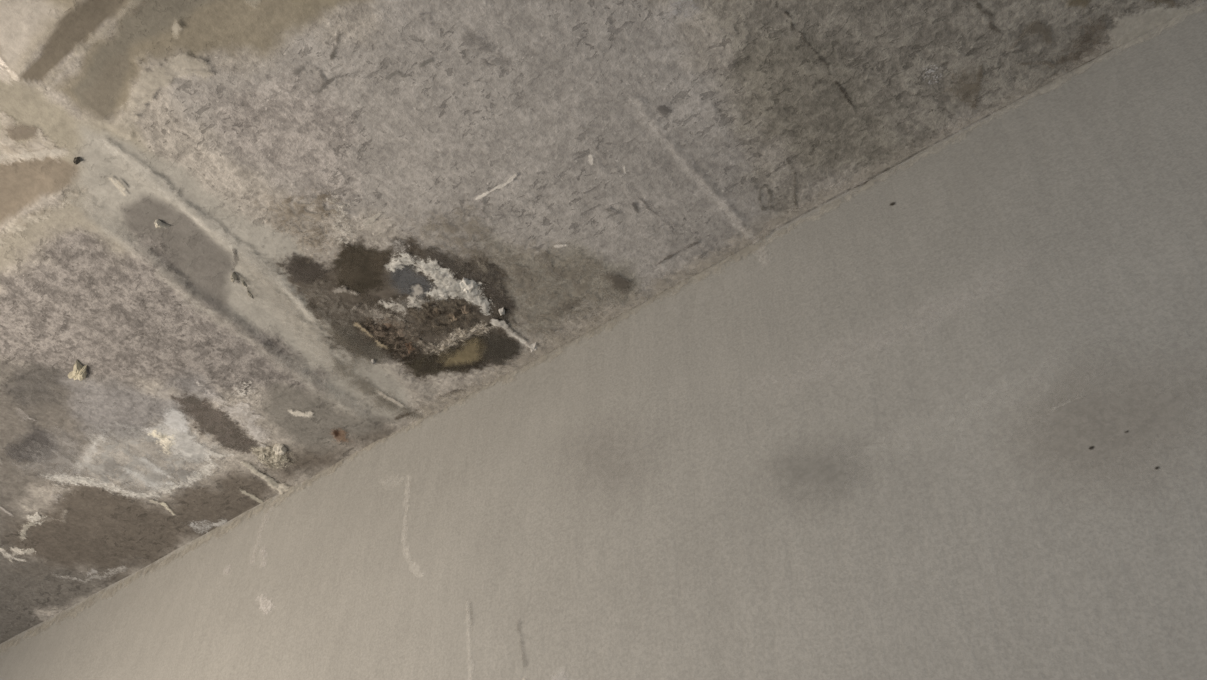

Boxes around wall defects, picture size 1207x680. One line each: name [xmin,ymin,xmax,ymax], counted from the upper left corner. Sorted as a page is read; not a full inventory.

spalling [364,295,481,359]
leakage [267,194,632,420]
leakage [7,382,289,515]
leakage [190,520,226,533]